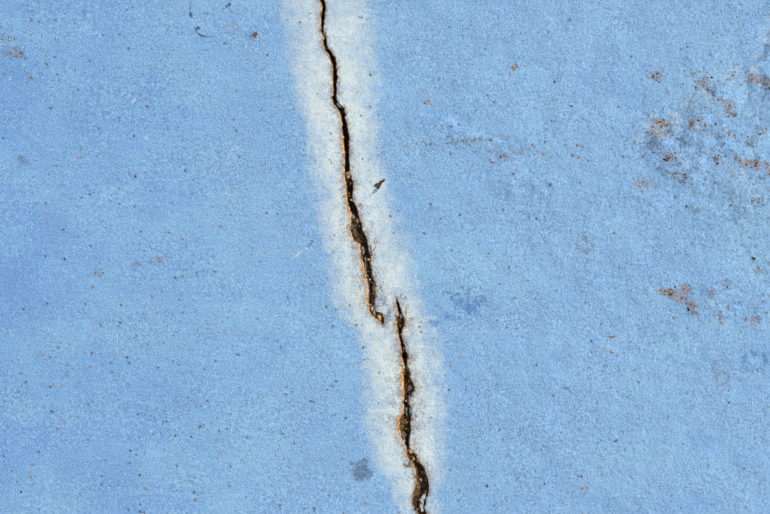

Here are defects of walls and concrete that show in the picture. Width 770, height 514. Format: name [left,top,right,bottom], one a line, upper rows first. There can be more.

damp [274,0,455,514]
crack [311,0,435,514]